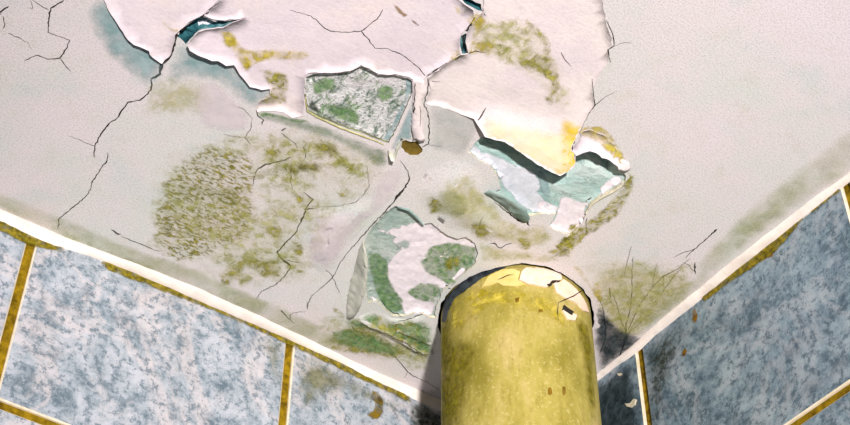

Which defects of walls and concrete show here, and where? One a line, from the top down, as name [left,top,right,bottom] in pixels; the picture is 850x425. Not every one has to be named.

crack [0,0,71,72]
crack [57,0,222,228]
peeling [104,0,631,235]
crack [291,10,486,147]
damp [0,221,60,250]
damp [156,148,318,284]
crack [253,128,370,297]
damp [102,262,564,425]
crack [281,162,410,320]
spalling [346,206,478,334]
damp [579,273,687,425]
damp [702,189,839,301]